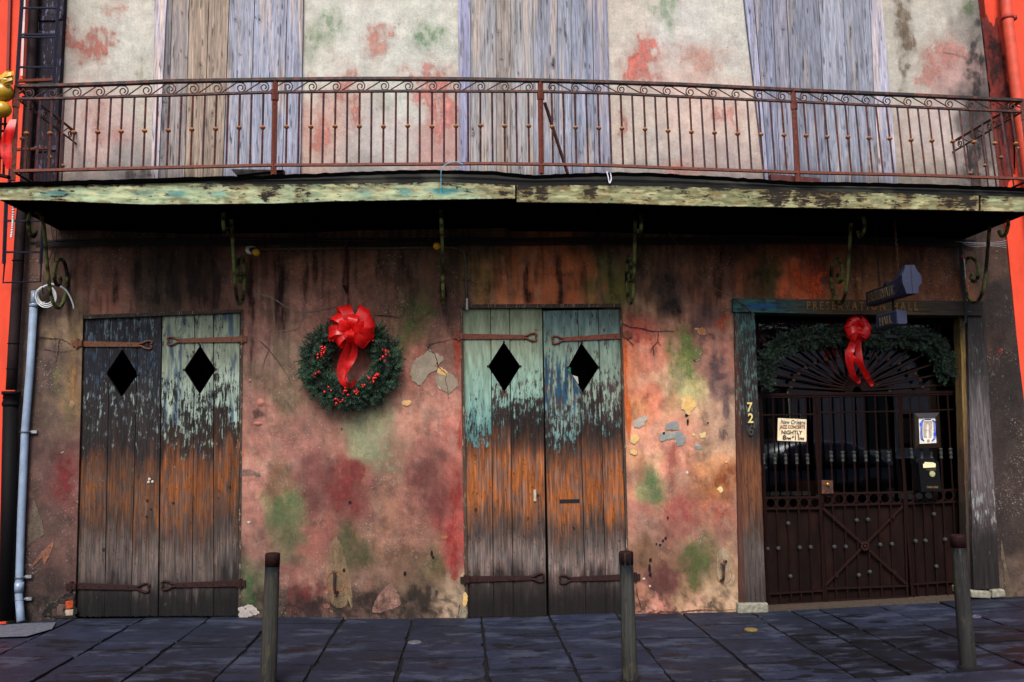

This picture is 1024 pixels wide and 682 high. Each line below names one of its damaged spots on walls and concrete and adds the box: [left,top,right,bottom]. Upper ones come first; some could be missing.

damp [897,0,1010,186]
damp [274,257,287,329]
crack [622,323,673,354]
spalling [681,397,706,446]